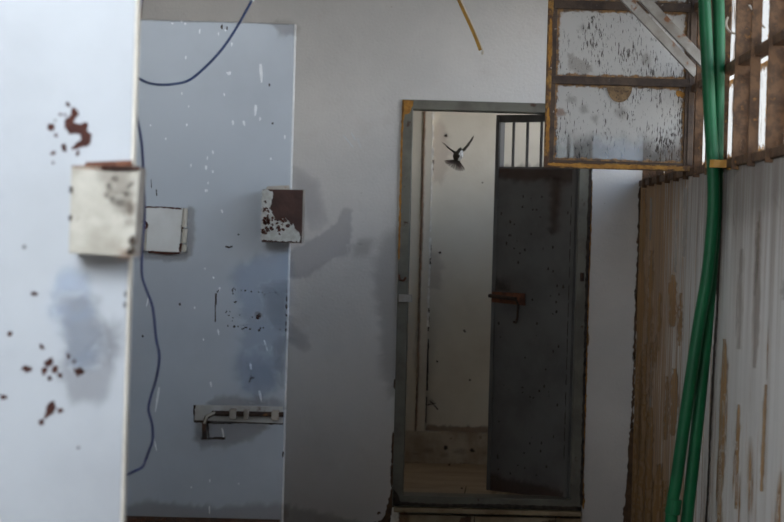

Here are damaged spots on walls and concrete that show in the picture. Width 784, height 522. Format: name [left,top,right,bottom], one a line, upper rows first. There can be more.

rust [47,102,92,164]
rust [21,357,62,381]
rust [38,401,64,425]